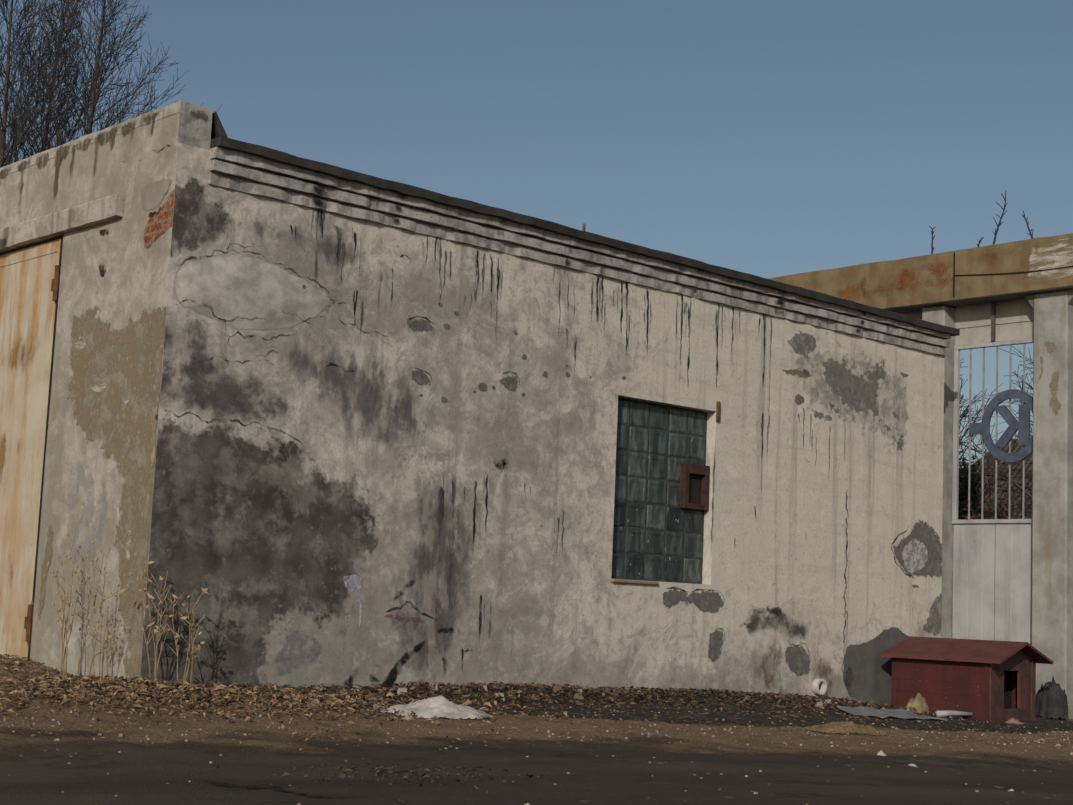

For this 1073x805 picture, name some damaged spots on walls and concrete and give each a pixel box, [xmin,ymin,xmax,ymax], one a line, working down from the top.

spalling [140,179,174,248]
peeling [1028,238,1073,279]
crack [180,243,395,368]
flaking render [783,333,904,450]
crack [165,410,309,454]
flaking render [68,307,166,679]
damp [140,326,378,687]
flaking render [891,520,942,588]
flaking render [663,586,725,613]
flaking render [708,628,725,662]
flaking render [785,644,811,676]
flaking render [923,594,942,637]